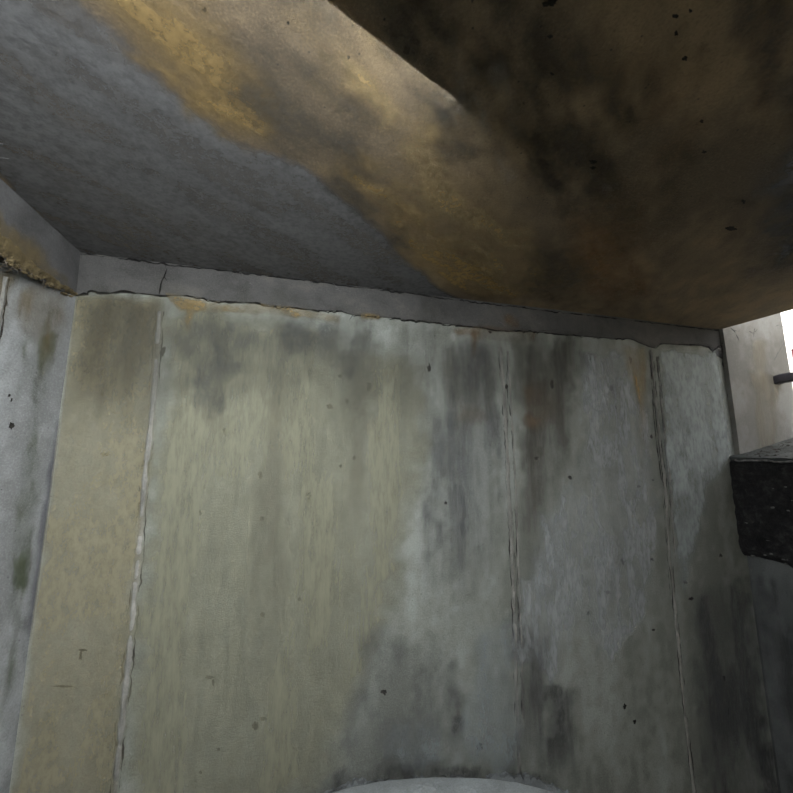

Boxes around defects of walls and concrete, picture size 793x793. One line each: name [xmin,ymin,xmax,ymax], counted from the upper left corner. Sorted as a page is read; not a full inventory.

spalling [0,233,78,297]
water stain [133,311,421,793]
water stain [431,768,479,778]